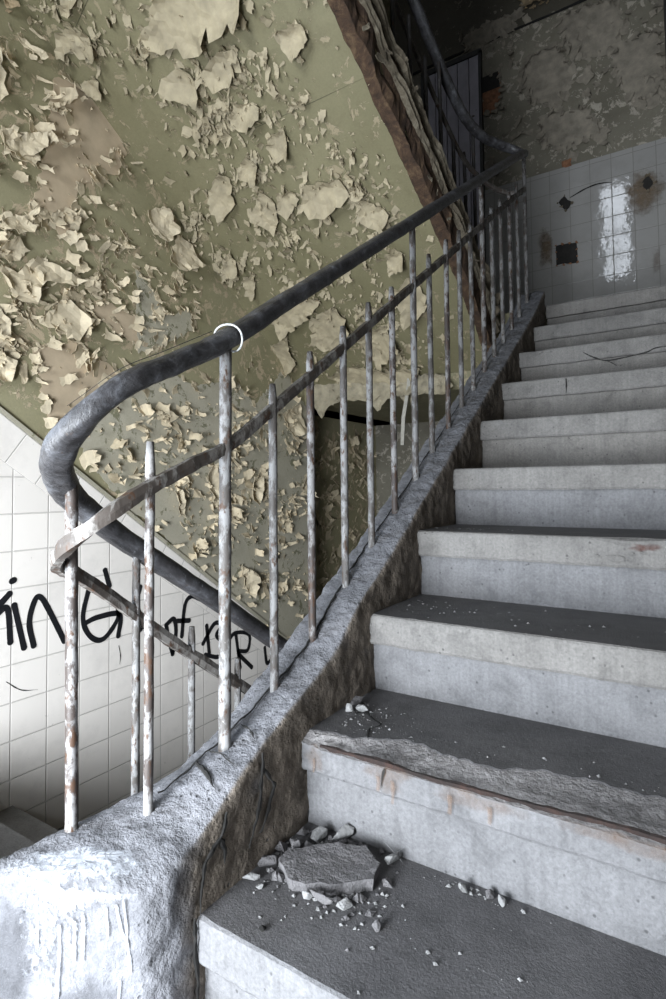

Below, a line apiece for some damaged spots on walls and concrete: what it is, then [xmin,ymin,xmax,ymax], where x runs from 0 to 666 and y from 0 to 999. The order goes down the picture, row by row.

peeling [0,0,401,429]
spalling [359,0,500,334]
peeling [458,0,666,168]
peeling [79,371,219,498]
peeling [131,459,219,583]
peeling [231,245,466,638]
rust [320,744,666,845]